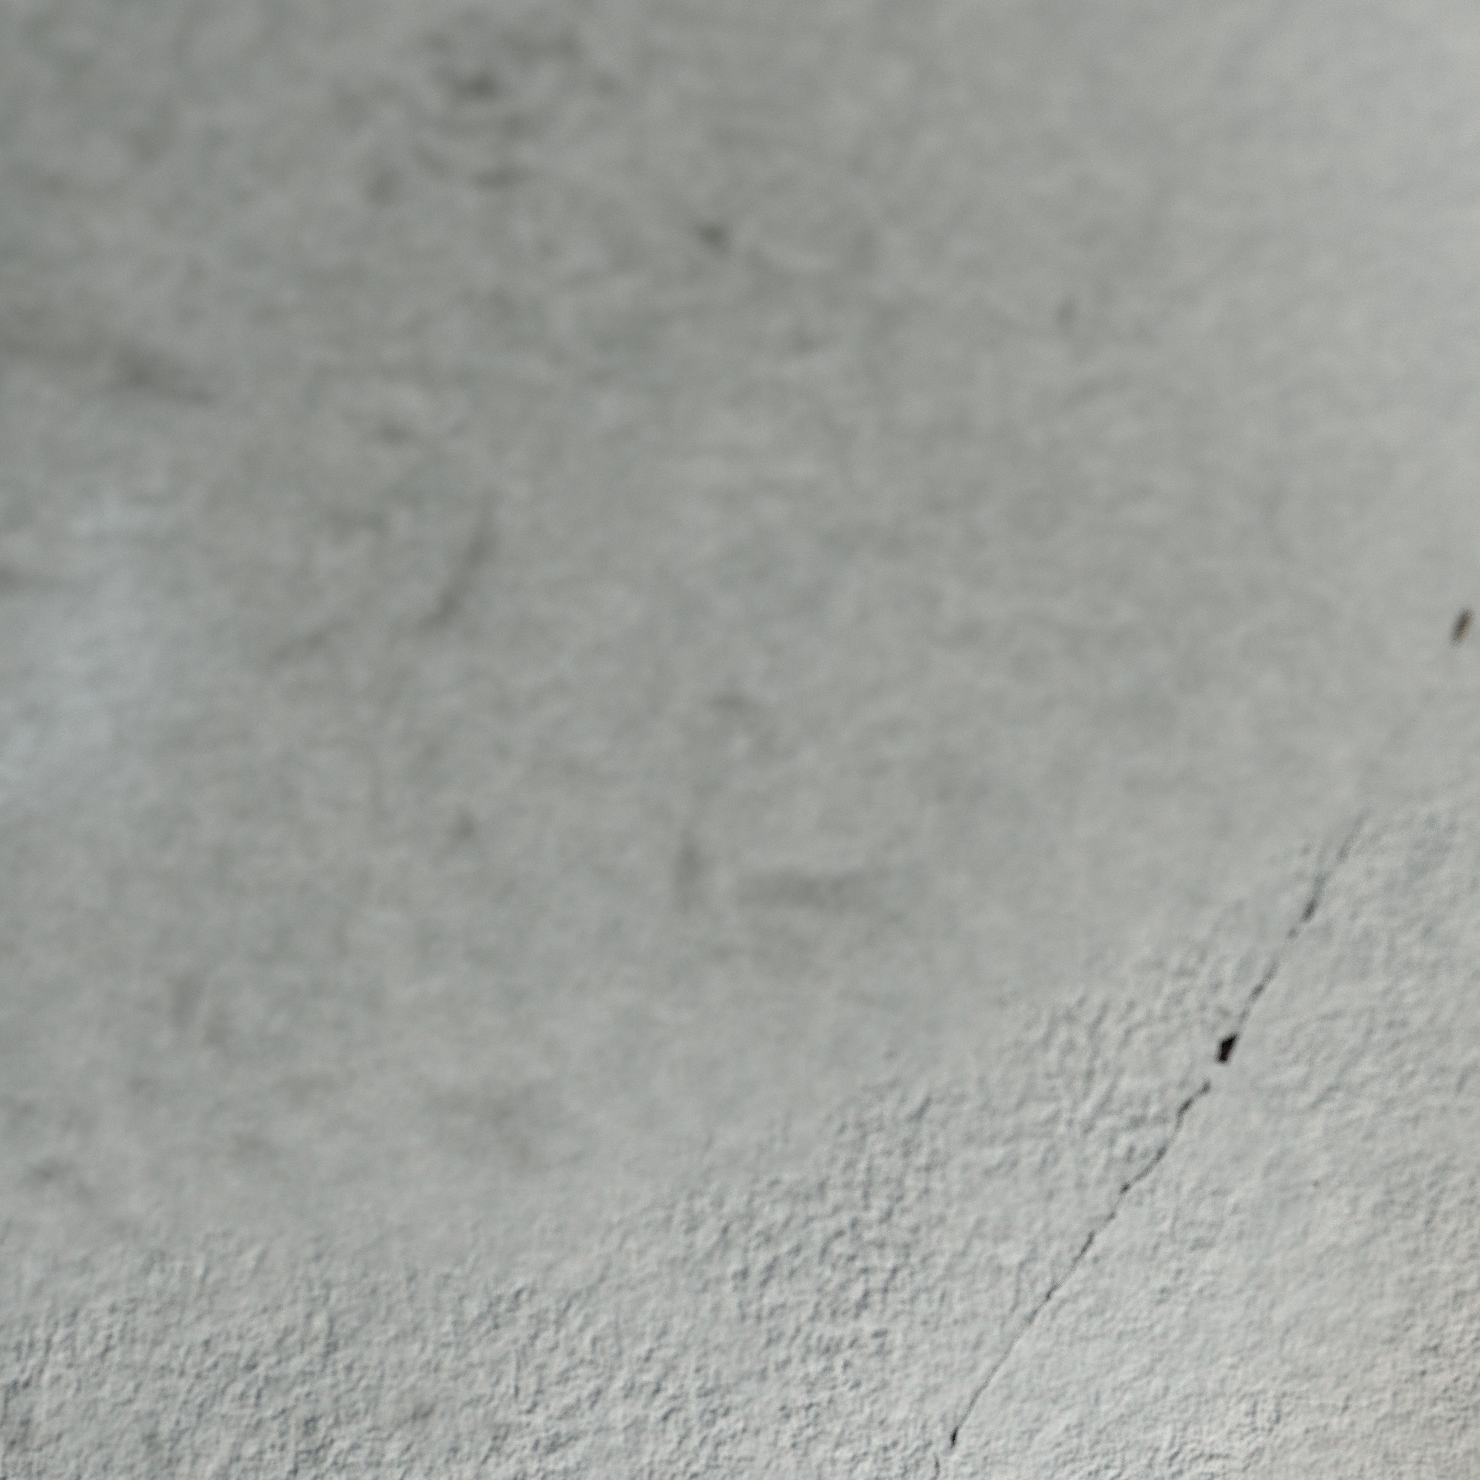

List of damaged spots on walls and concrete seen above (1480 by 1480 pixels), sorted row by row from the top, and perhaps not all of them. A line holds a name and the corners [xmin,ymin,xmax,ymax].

crack [1210,652,1461,1030]
crack [935,1077,1210,1480]